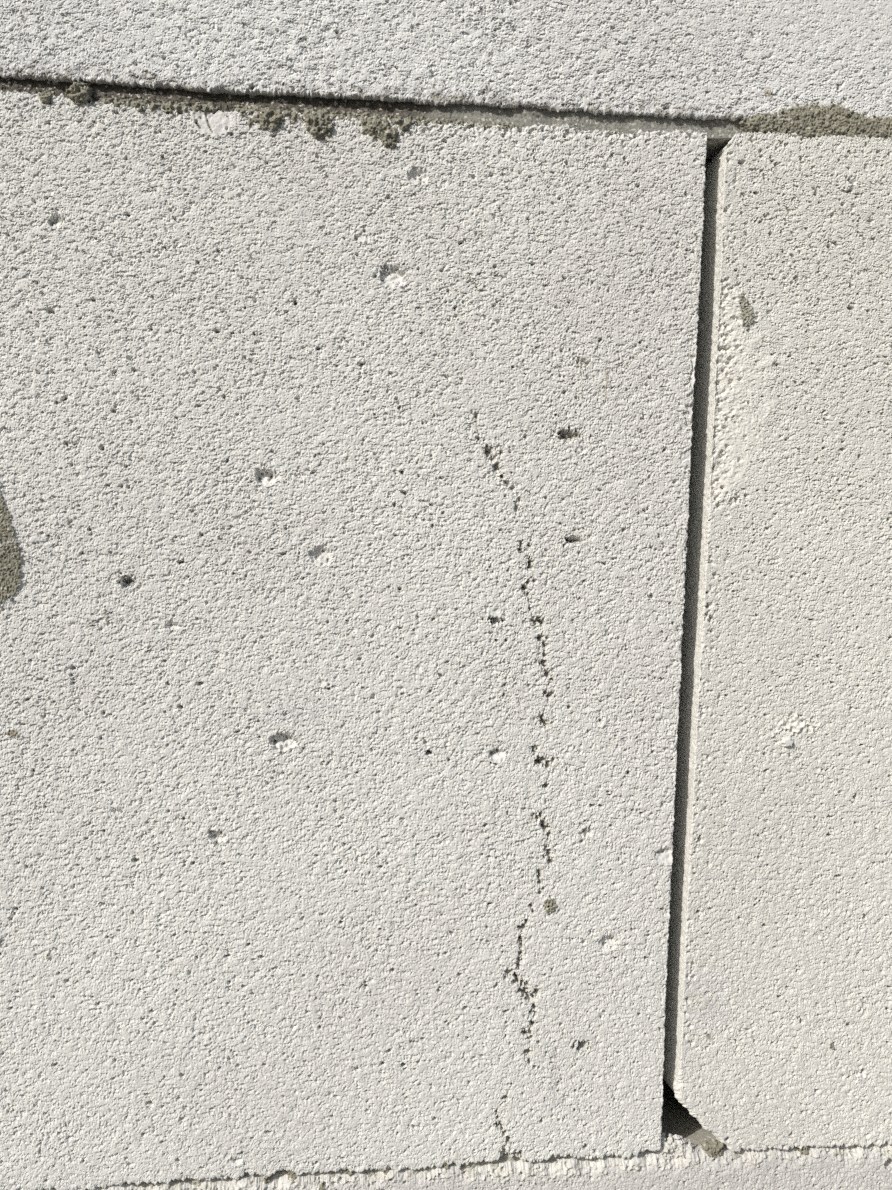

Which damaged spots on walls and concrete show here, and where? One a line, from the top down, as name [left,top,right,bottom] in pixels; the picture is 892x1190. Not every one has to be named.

crack [470,409,556,1159]